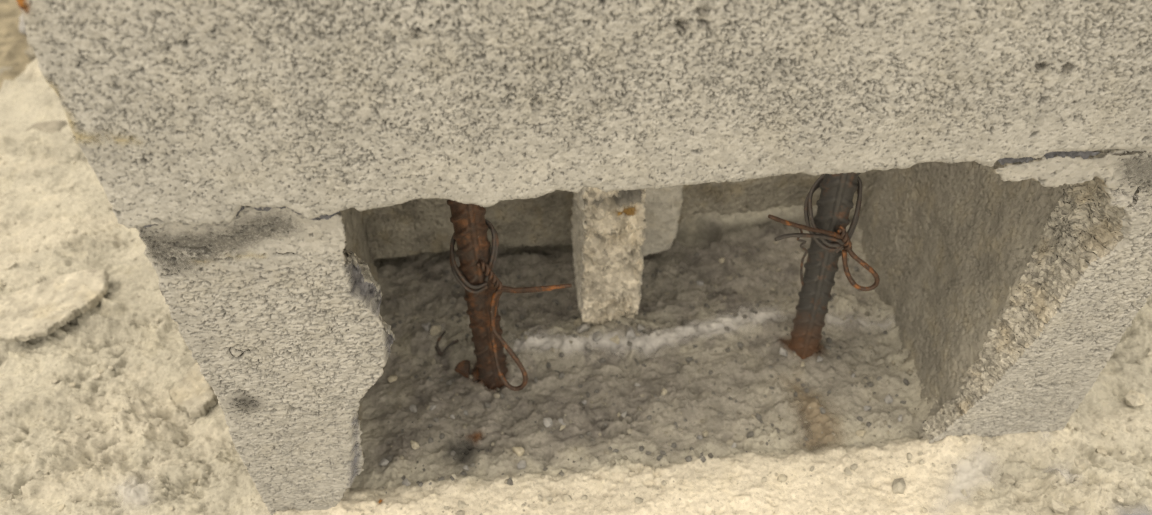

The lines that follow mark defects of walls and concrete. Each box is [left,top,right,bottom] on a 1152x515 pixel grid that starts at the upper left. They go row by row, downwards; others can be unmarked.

crack [997,151,1146,165]
spalling [593,189,642,207]
crack [1127,188,1139,207]
spalling [348,263,382,312]
spalling [447,199,508,389]
spalling [789,172,861,359]